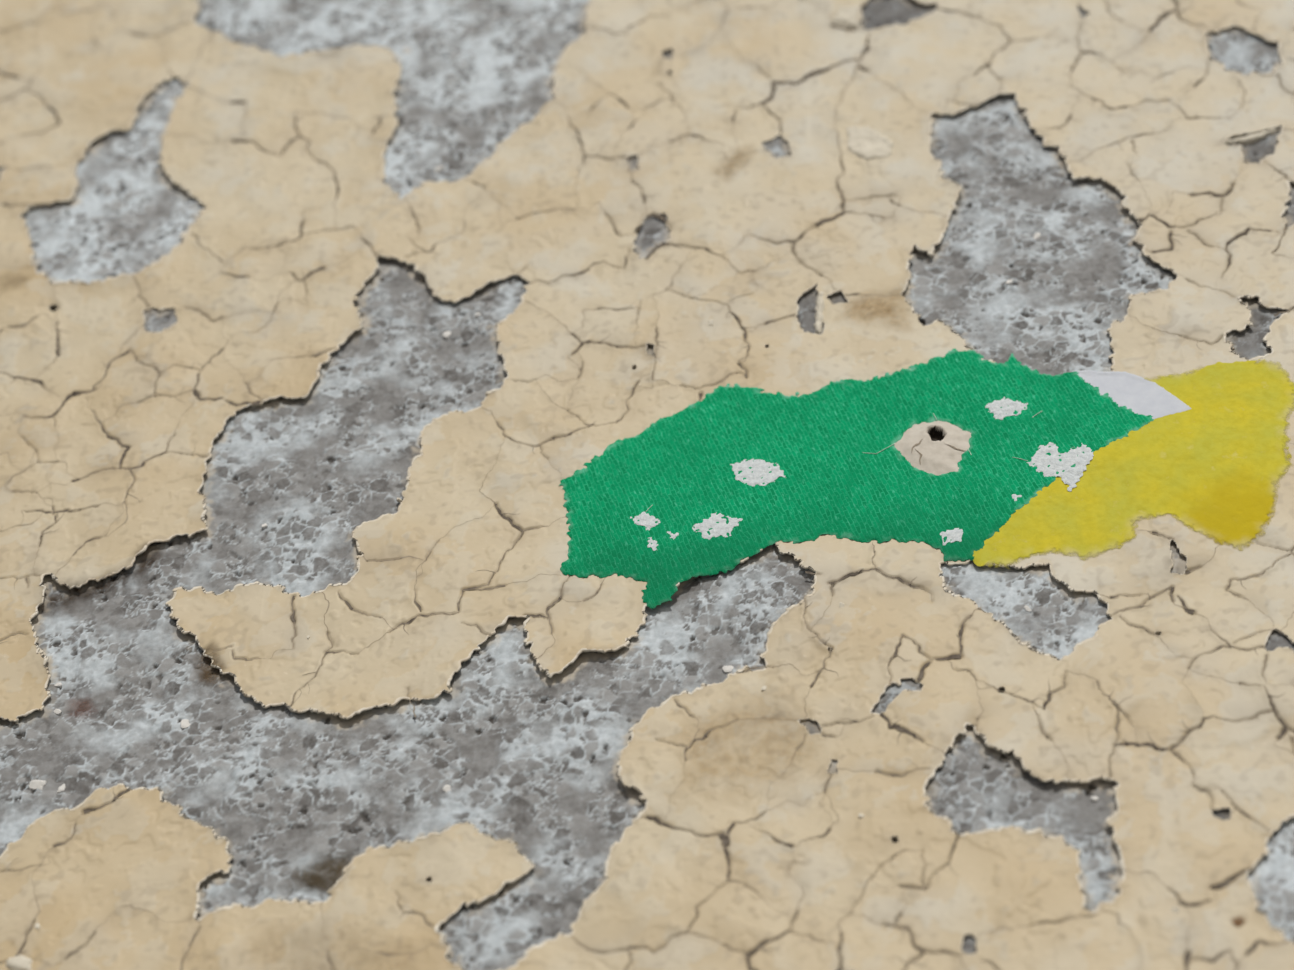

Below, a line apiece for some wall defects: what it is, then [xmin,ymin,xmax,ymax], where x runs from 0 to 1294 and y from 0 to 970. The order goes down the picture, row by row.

peeling [20,76,208,284]
peeling [193,0,591,200]
crack [0,0,1294,706]
peeling [795,283,849,335]
peeling [900,92,1179,376]
peeling [1204,24,1284,76]
peeling [0,254,817,970]
peeling [938,560,1113,661]
crack [321,893,441,970]
crack [574,542,1294,970]
peeling [922,722,1125,912]
peeling [1244,814,1294,943]